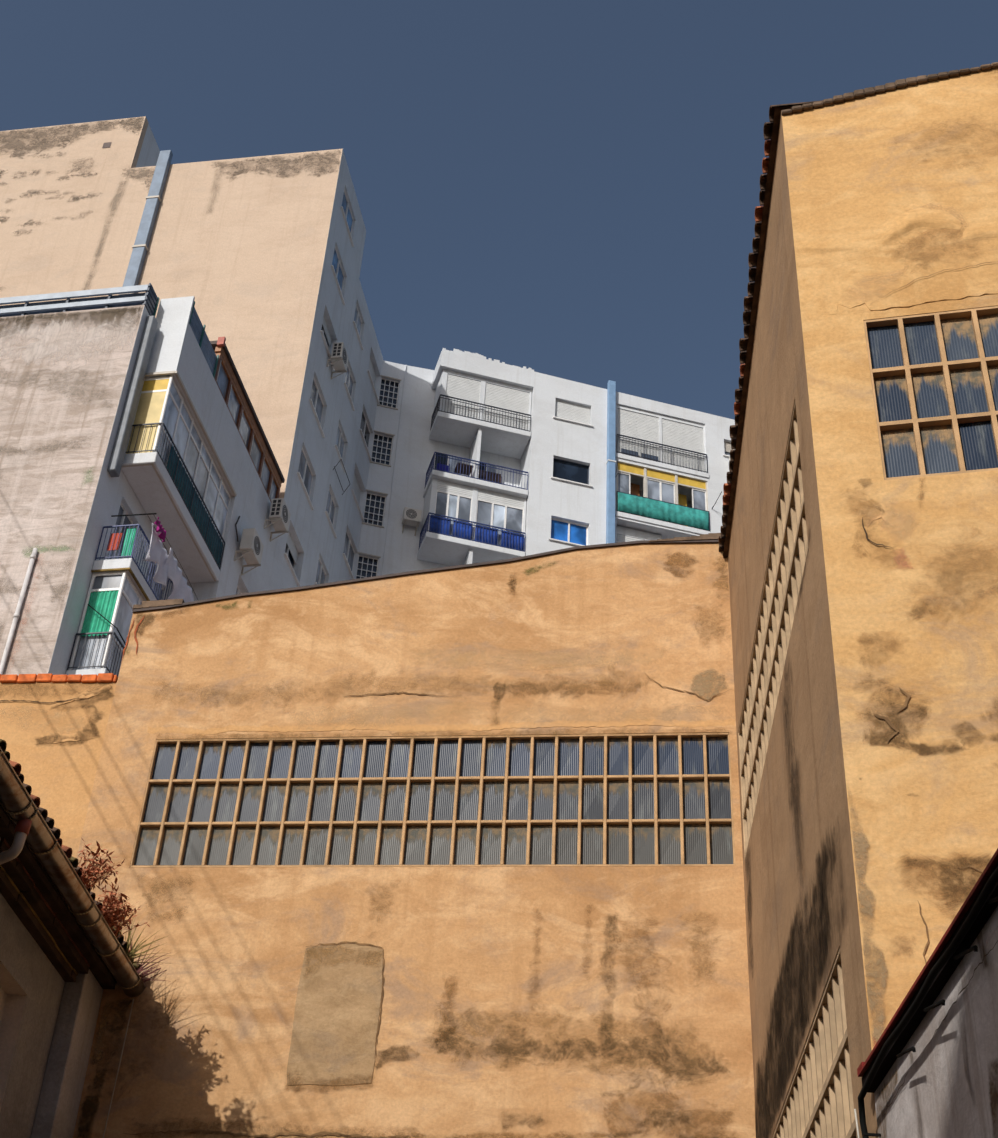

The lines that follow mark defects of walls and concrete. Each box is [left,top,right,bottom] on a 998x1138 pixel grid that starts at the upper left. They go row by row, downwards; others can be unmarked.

crack [644,672,731,701]
leakage [862,680,970,755]
leakage [784,697,801,867]
leakage [905,856,988,900]
leakage [755,842,843,1138]
leakage [435,1011,571,1067]
leakage [579,1020,729,1138]